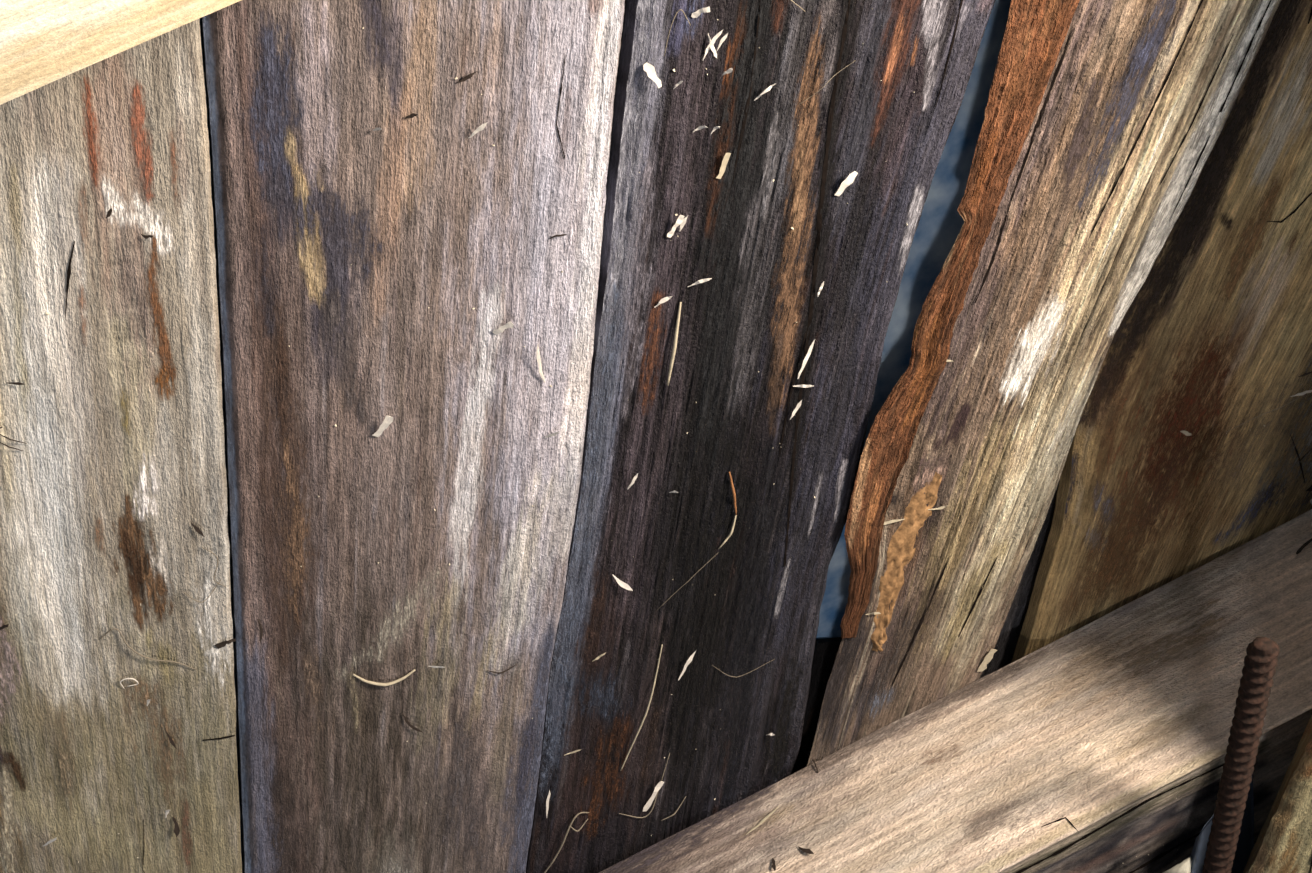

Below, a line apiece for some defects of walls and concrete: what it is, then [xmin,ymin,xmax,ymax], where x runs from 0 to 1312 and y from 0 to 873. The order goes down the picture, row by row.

rust [79,78,100,240]
rust [131,81,153,202]
crack [975,27,1073,303]
crack [1089,0,1203,238]
rust [148,236,176,399]
rust [1065,321,1287,613]